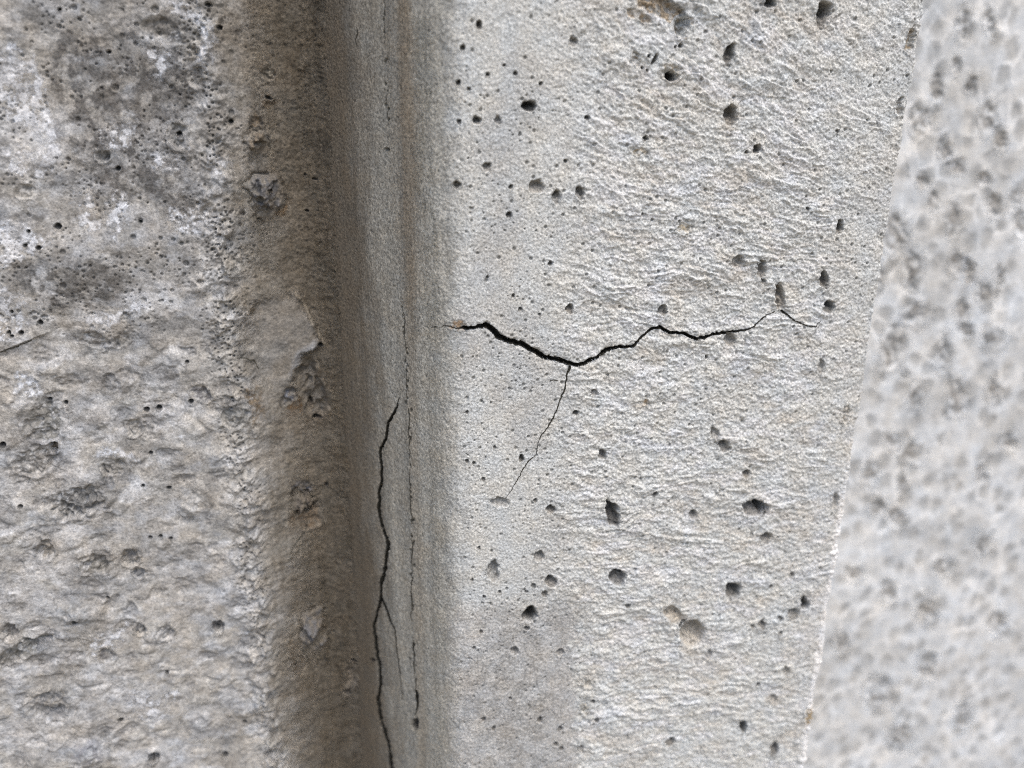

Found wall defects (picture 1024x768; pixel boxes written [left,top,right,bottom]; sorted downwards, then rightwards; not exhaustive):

crack [372,307,419,768]
crack [431,310,820,496]